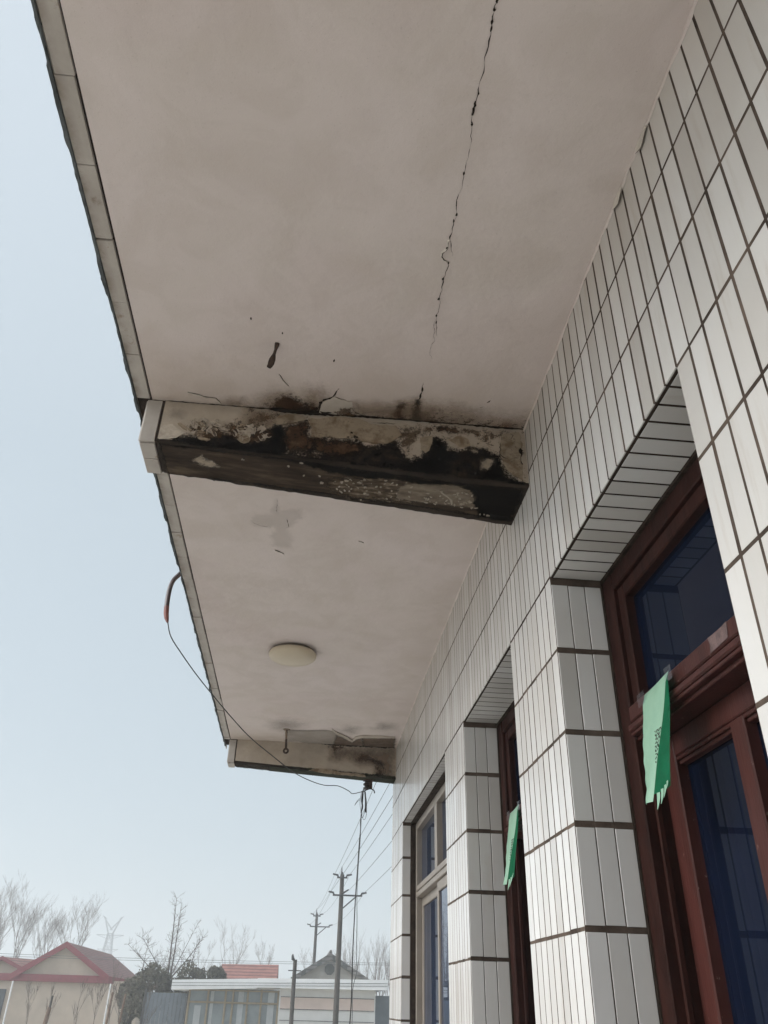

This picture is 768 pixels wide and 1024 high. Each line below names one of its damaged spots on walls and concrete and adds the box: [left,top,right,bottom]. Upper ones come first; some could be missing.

crack [430,0,498,357]
peeling [159,390,405,445]
peeling [193,456,218,467]
damp [159,396,524,521]
peeling [420,436,433,453]
peeling [471,432,523,481]
flaking render [318,475,490,516]
flaking render [287,729,395,748]
damp [237,745,396,784]